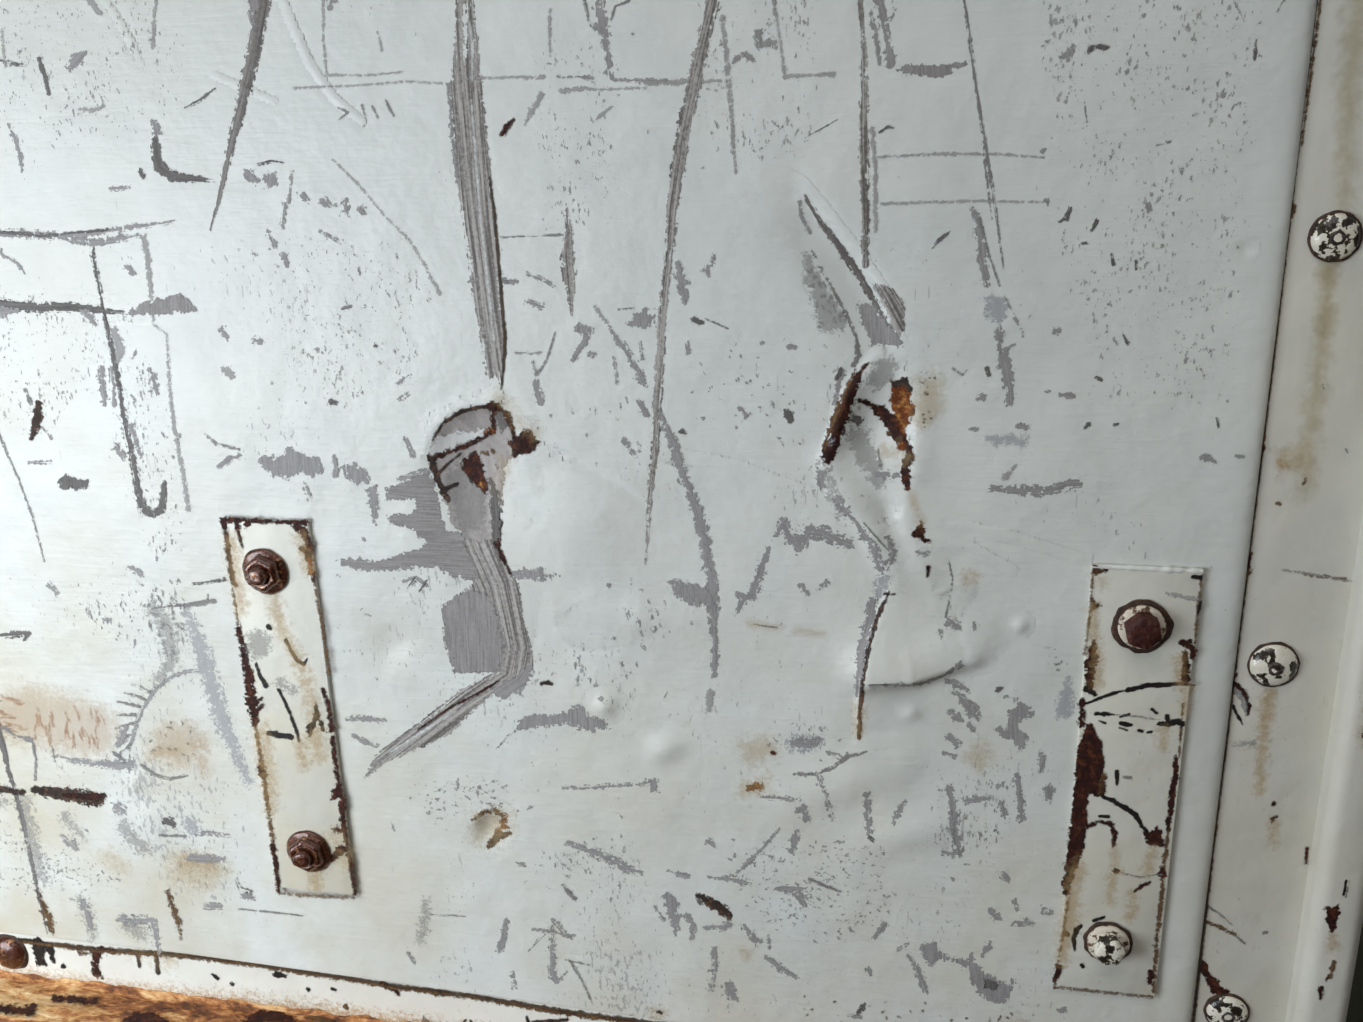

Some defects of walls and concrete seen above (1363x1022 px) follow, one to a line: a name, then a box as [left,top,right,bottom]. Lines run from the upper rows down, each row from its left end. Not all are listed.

corrosion [427,401,516,503]
peeling [685,341,795,446]
corrosion [821,362,935,491]
peeling [968,422,1030,447]
peeling [402,576,428,592]
peeling [735,516,855,614]
peeling [936,616,976,638]
peeling [266,703,327,740]
corrosion [471,807,512,849]
corrosion [1052,564,1185,999]
corrosion [0,889,663,1022]